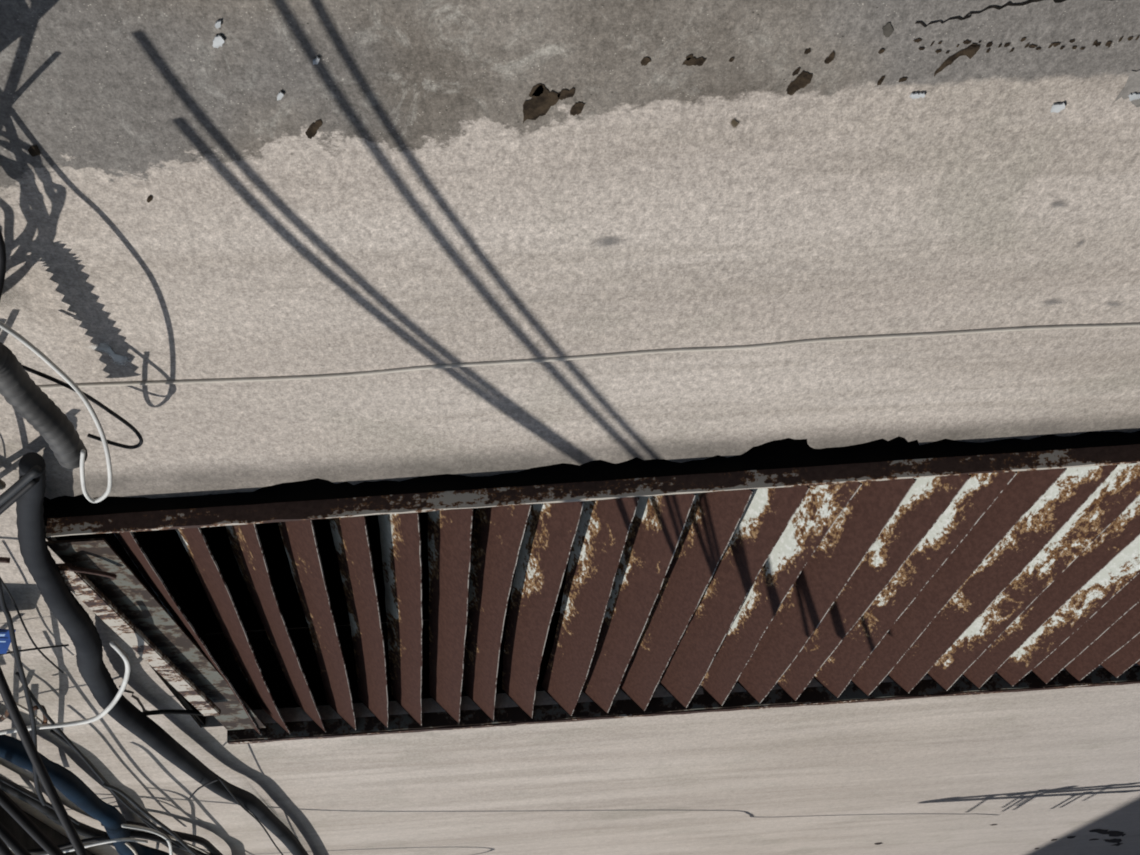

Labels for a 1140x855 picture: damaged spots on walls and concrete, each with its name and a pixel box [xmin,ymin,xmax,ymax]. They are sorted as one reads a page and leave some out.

crack [915,0,1066,27]
peeling [212,20,224,48]
spalling [878,23,893,54]
spalling [682,55,706,66]
spalling [918,35,1140,77]
spalling [786,68,813,95]
peeling [899,77,925,99]
peeling [1114,70,1140,108]
spalling [523,84,585,123]
spalling [305,120,322,139]